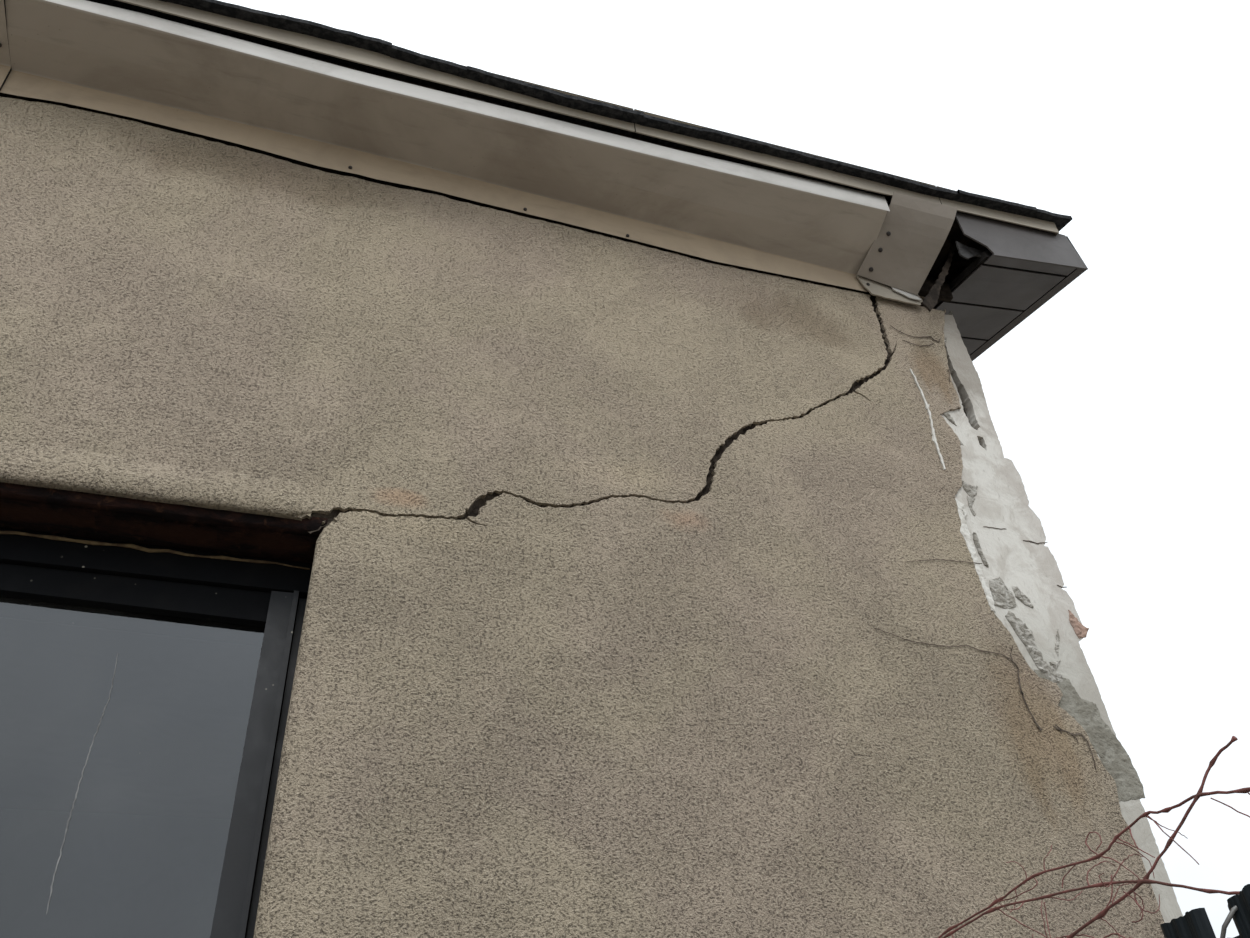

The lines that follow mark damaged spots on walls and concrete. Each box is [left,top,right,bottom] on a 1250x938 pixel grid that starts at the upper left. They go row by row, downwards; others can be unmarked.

crack [676,292,968,503]
crack [304,509,383,534]
crack [416,492,640,520]
spalling [909,311,1183,923]